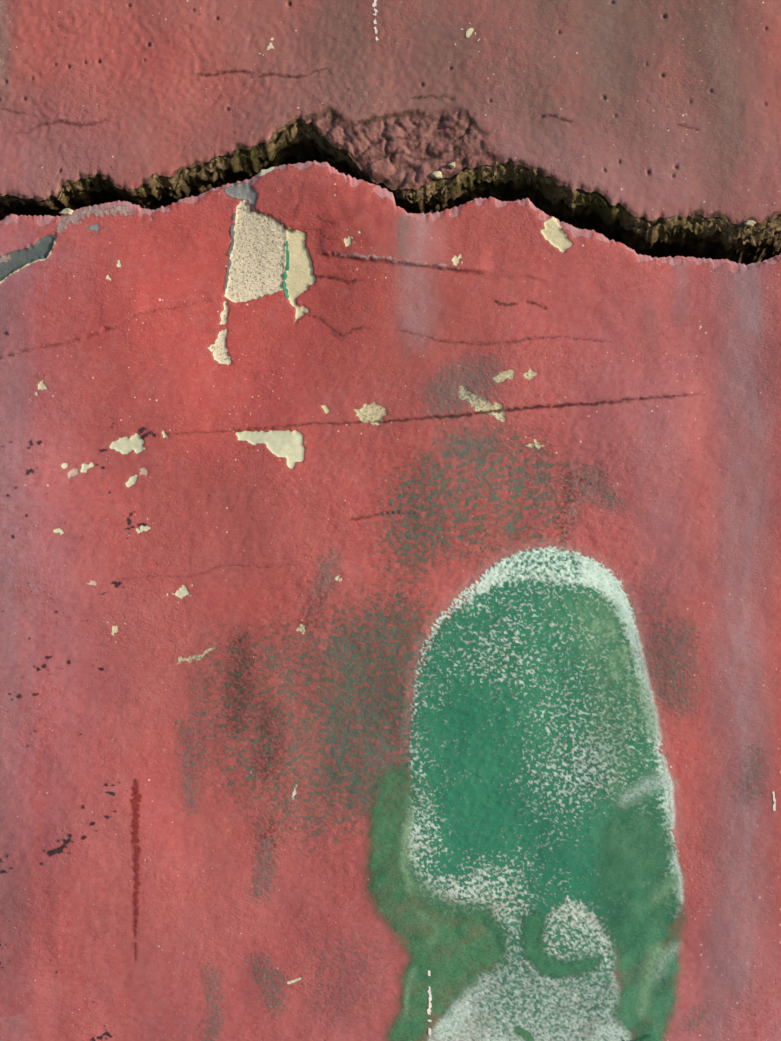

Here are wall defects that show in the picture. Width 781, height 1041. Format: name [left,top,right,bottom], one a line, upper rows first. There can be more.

crack [0,116,781,282]
peeling [541,216,572,252]
peeling [0,235,56,284]
peeling [208,183,315,365]
peeling [354,402,386,425]
crack [359,395,675,423]
peeling [109,433,146,454]
peeling [236,430,305,469]